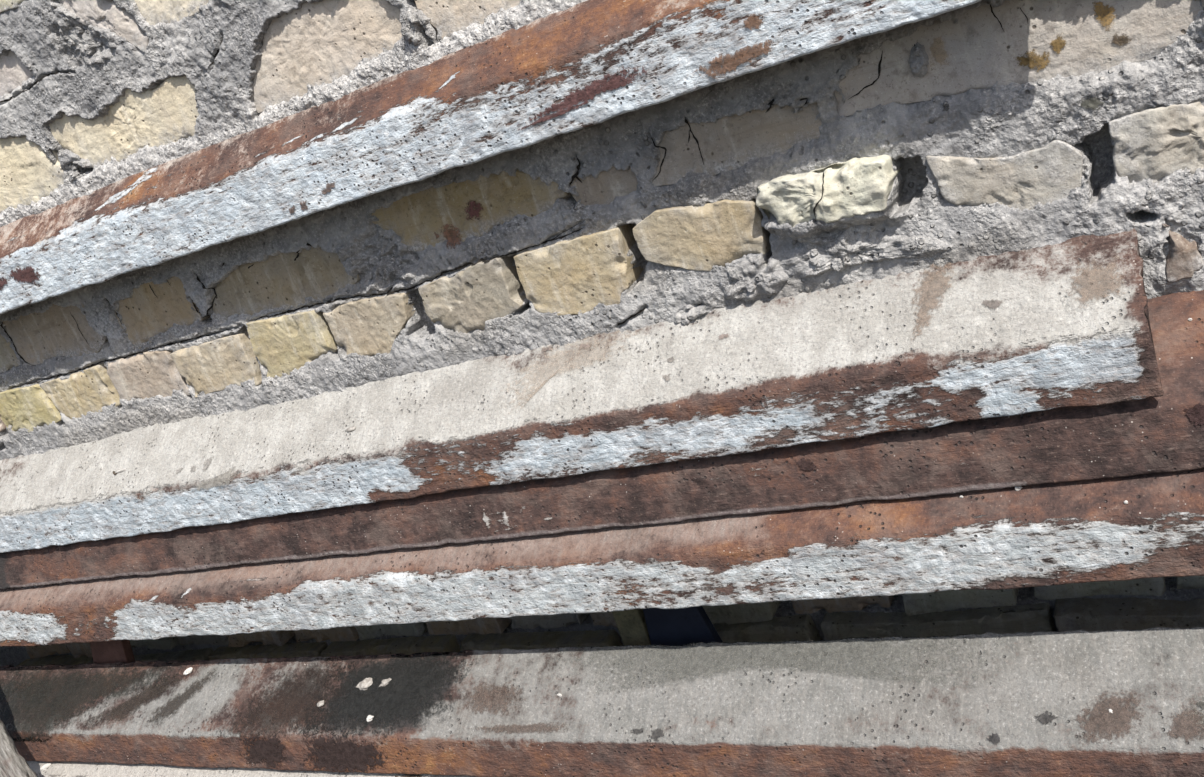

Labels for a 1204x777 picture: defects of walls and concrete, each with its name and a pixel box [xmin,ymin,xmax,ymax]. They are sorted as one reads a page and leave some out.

spalling [54,16,117,67]
corrosion [693,14,774,82]
spalling [908,42,929,77]
corrosion [517,65,647,131]
spalling [64,159,94,182]
corrosion [0,266,40,290]
spalling [335,224,420,297]
water stain [0,662,215,742]
water stain [227,651,471,739]
corrosion [466,684,568,734]
corrosion [1076,690,1144,744]
corrosion [239,731,388,773]